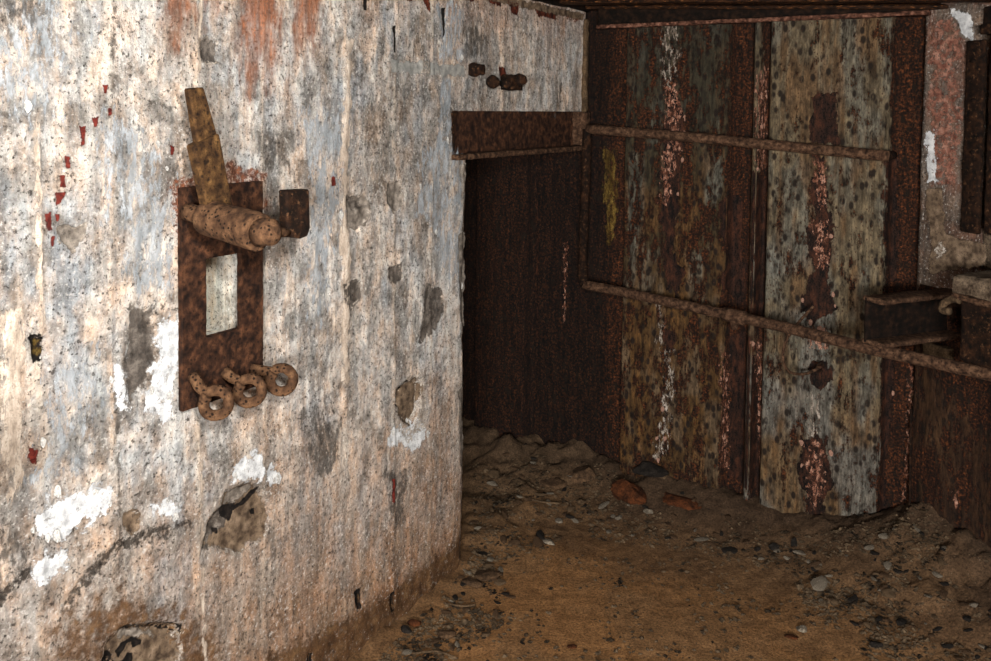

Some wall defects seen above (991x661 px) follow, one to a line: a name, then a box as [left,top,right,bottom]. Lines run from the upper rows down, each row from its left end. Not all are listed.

peeling [0,0,100,130]
rust [241,0,319,96]
peeling [923,8,987,275]
peeling [23,105,182,587]
rust [797,92,841,515]
spalling [202,449,282,556]